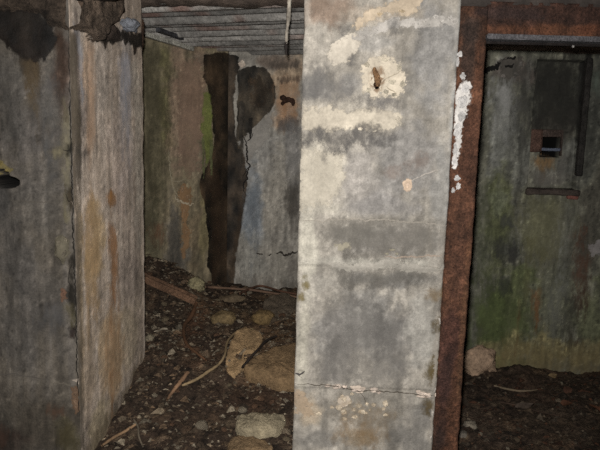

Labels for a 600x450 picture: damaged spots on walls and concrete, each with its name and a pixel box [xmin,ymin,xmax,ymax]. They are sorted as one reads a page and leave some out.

spalling [0,0,125,42]
damp [199,52,288,285]
damp [0,10,82,423]
crack [256,249,298,257]
crack [295,371,435,404]